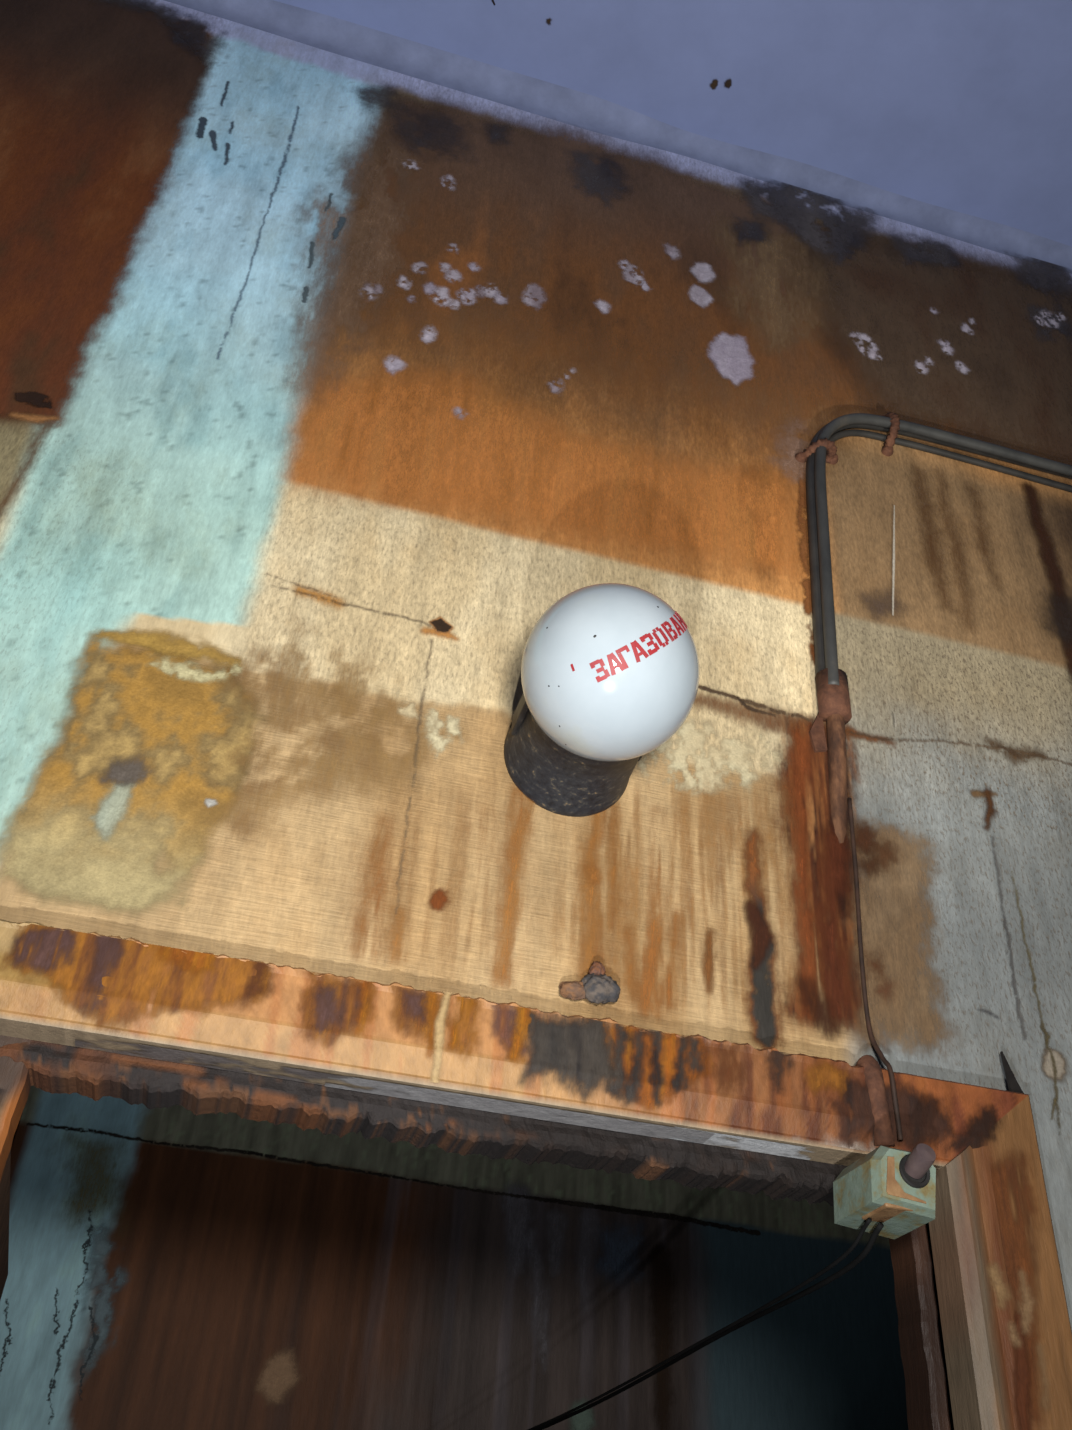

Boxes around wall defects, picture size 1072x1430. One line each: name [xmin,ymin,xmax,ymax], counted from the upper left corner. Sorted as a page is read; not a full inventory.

crack [218,106,299,359]
water stain [725,180,1072,465]
peeling [2,630,261,910]
crack [698,685,810,721]
crack [852,732,1072,765]
rust [695,696,893,1036]
rust [7,924,350,1085]
peeling [325,1077,811,1160]
rust [771,1050,791,1088]
rust [808,1063,997,1151]